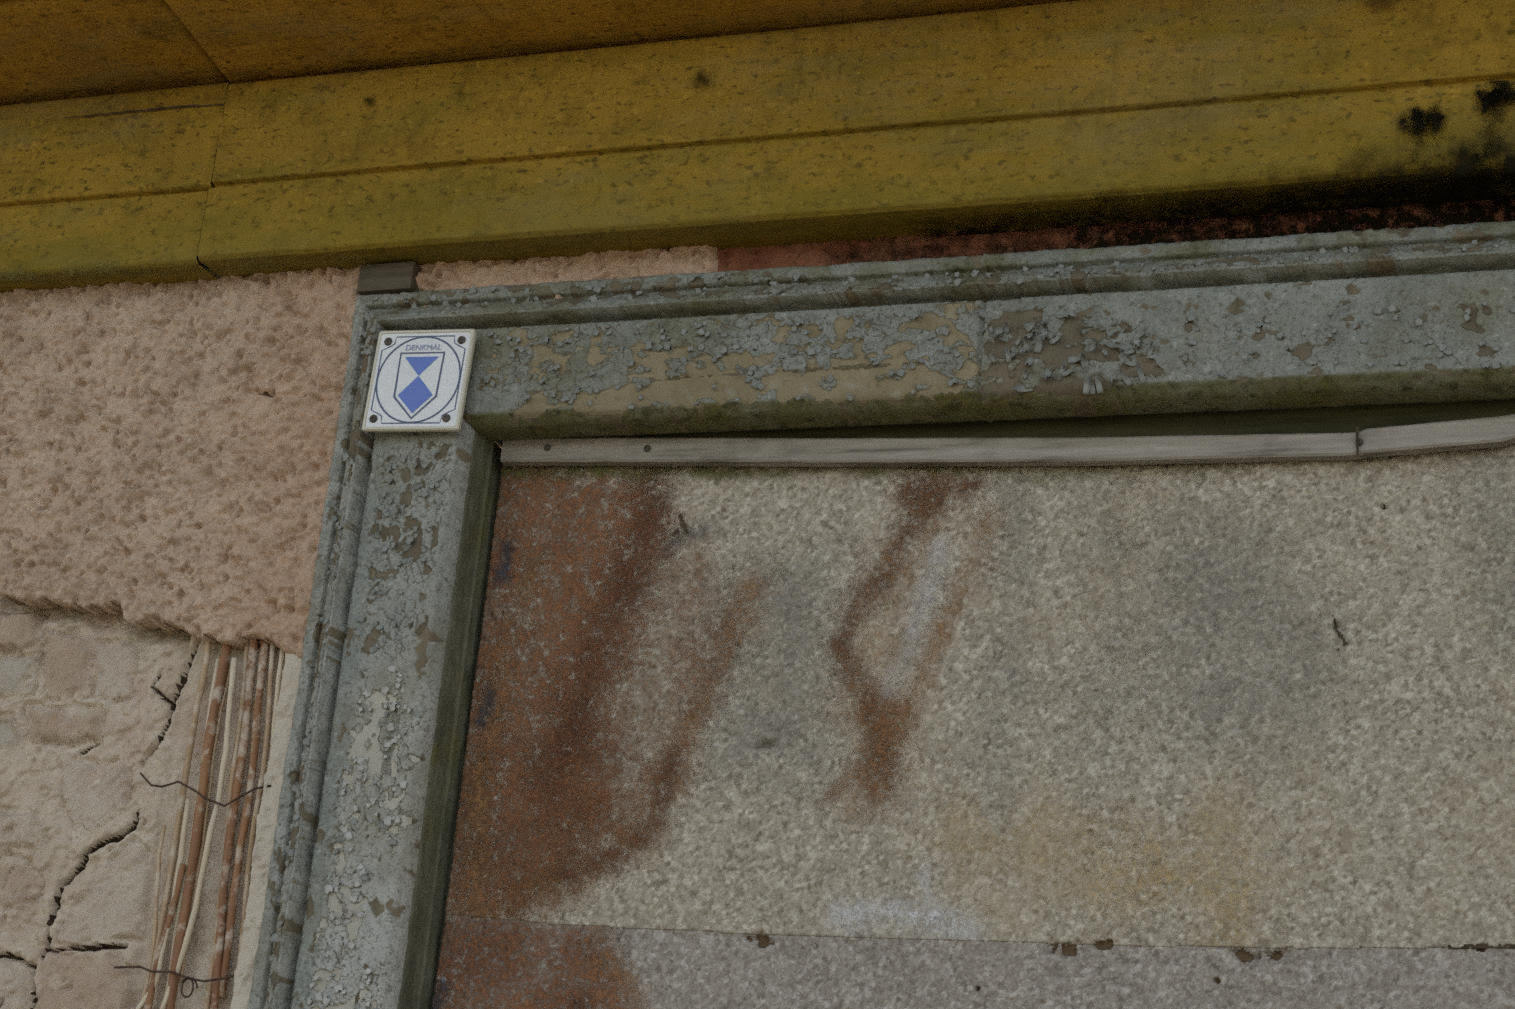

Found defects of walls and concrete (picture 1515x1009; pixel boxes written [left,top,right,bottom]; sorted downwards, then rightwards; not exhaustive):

water stain [846,80,1515,263]
peeling [484,260,1163,419]
peeling [1218,303,1453,377]
peeling [1461,301,1500,369]
crack [151,646,198,743]
flaking render [0,272,824,1009]
corrosion [432,465,758,1009]
corrosion [831,476,981,796]
crack [0,812,139,1009]
spalling [1050,939,1114,956]
spalling [1236,948,1283,962]